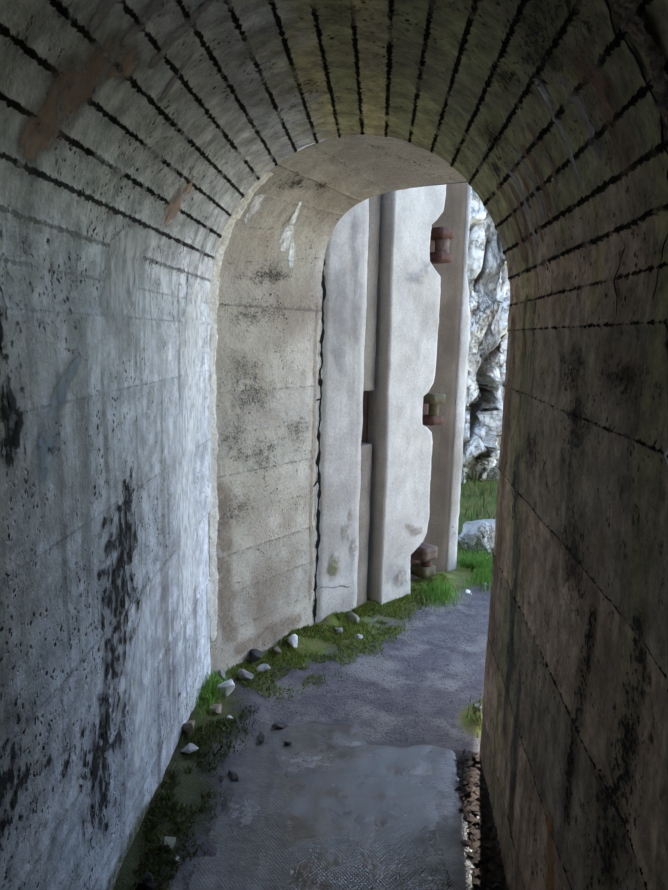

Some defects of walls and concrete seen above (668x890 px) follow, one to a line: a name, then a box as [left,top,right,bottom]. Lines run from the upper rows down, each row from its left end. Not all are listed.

crack [604,0,668,181]
leakage [103,230,142,327]
crack [613,245,626,314]
crack [652,234,668,300]
leakage [174,171,331,654]
leakage [131,582,149,771]
leakage [504,452,520,838]
leakage [563,592,597,831]
leakage [592,609,650,889]